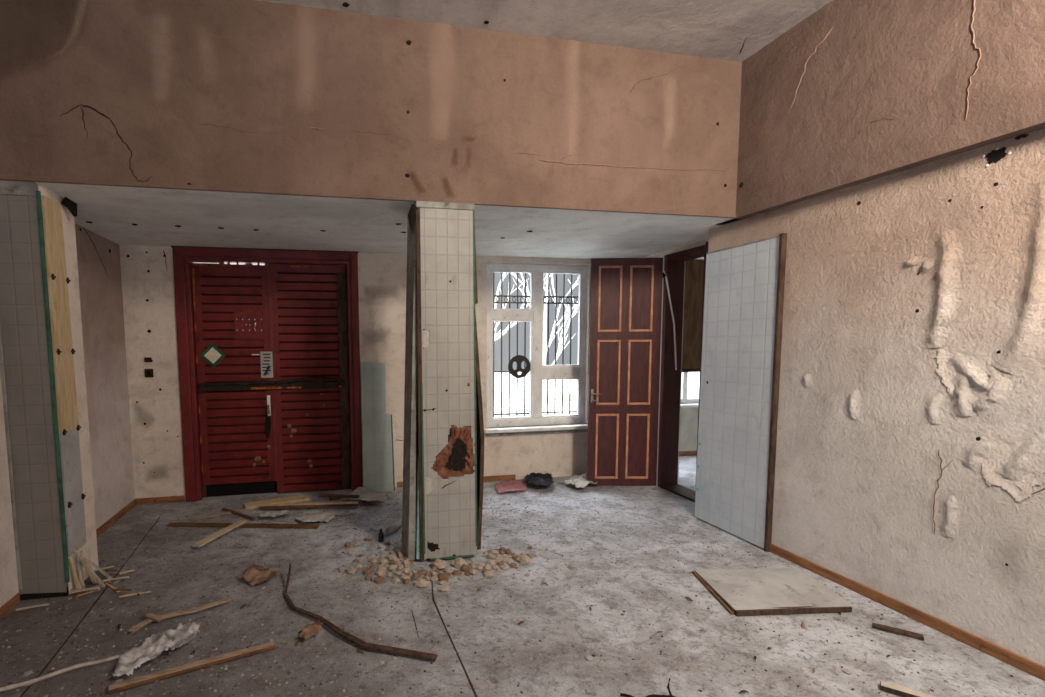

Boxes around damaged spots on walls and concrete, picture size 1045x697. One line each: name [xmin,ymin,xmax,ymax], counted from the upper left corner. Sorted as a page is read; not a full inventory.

crack [964,0,981,120]
crack [60,104,152,182]
spalling [446,437,467,471]
crack [931,449,953,535]